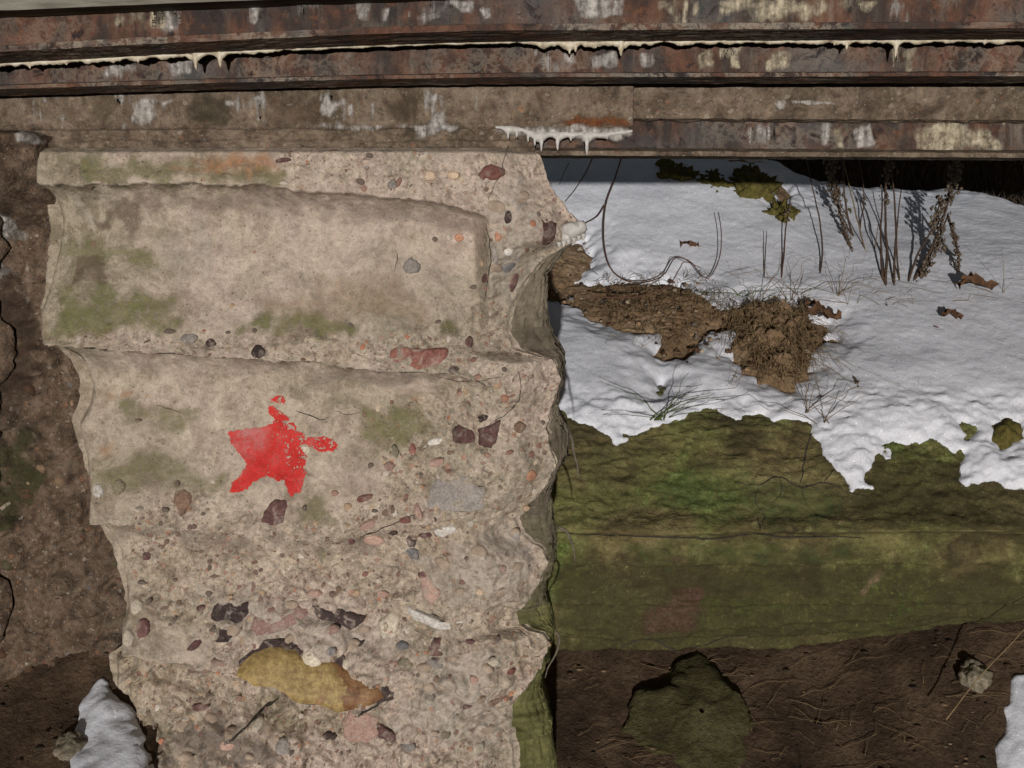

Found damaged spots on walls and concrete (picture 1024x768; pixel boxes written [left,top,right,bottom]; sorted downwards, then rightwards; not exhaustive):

leakage [0,40,1024,76]
leakage [386,91,457,137]
leakage [496,124,632,155]
corrosion [565,115,628,131]